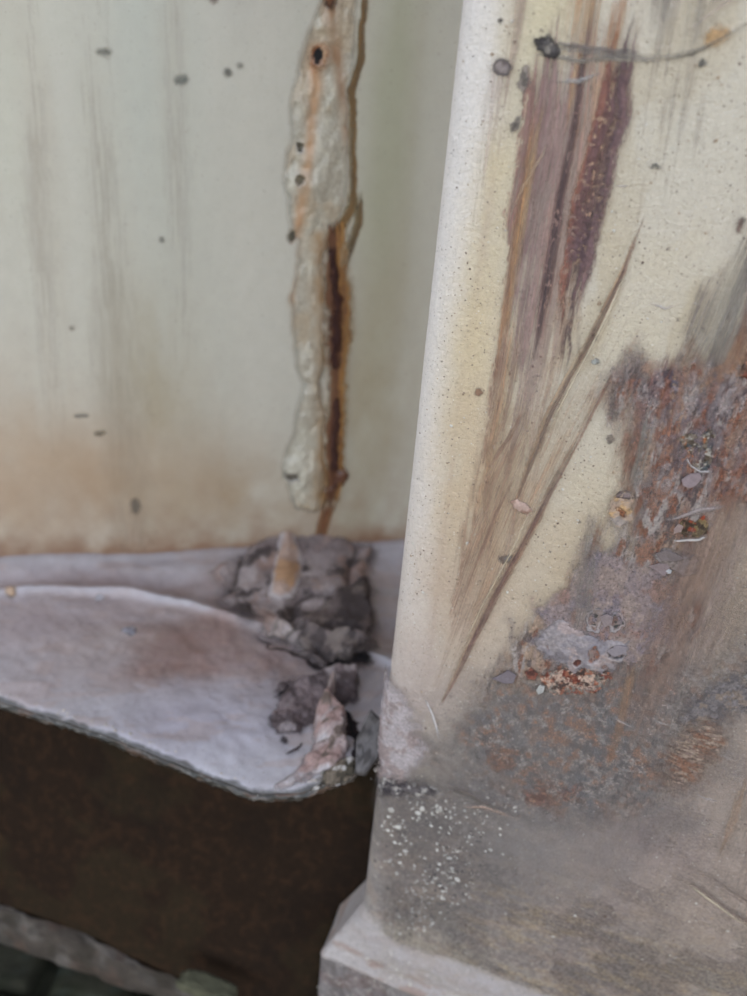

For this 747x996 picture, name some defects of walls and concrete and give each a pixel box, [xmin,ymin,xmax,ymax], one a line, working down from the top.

corrosion [315,0,368,535]
corrosion [477,0,635,504]
peeling [269,663,360,744]
peeling [377,671,425,780]
efflorescence [373,786,531,936]
corrosion [486,338,747,819]